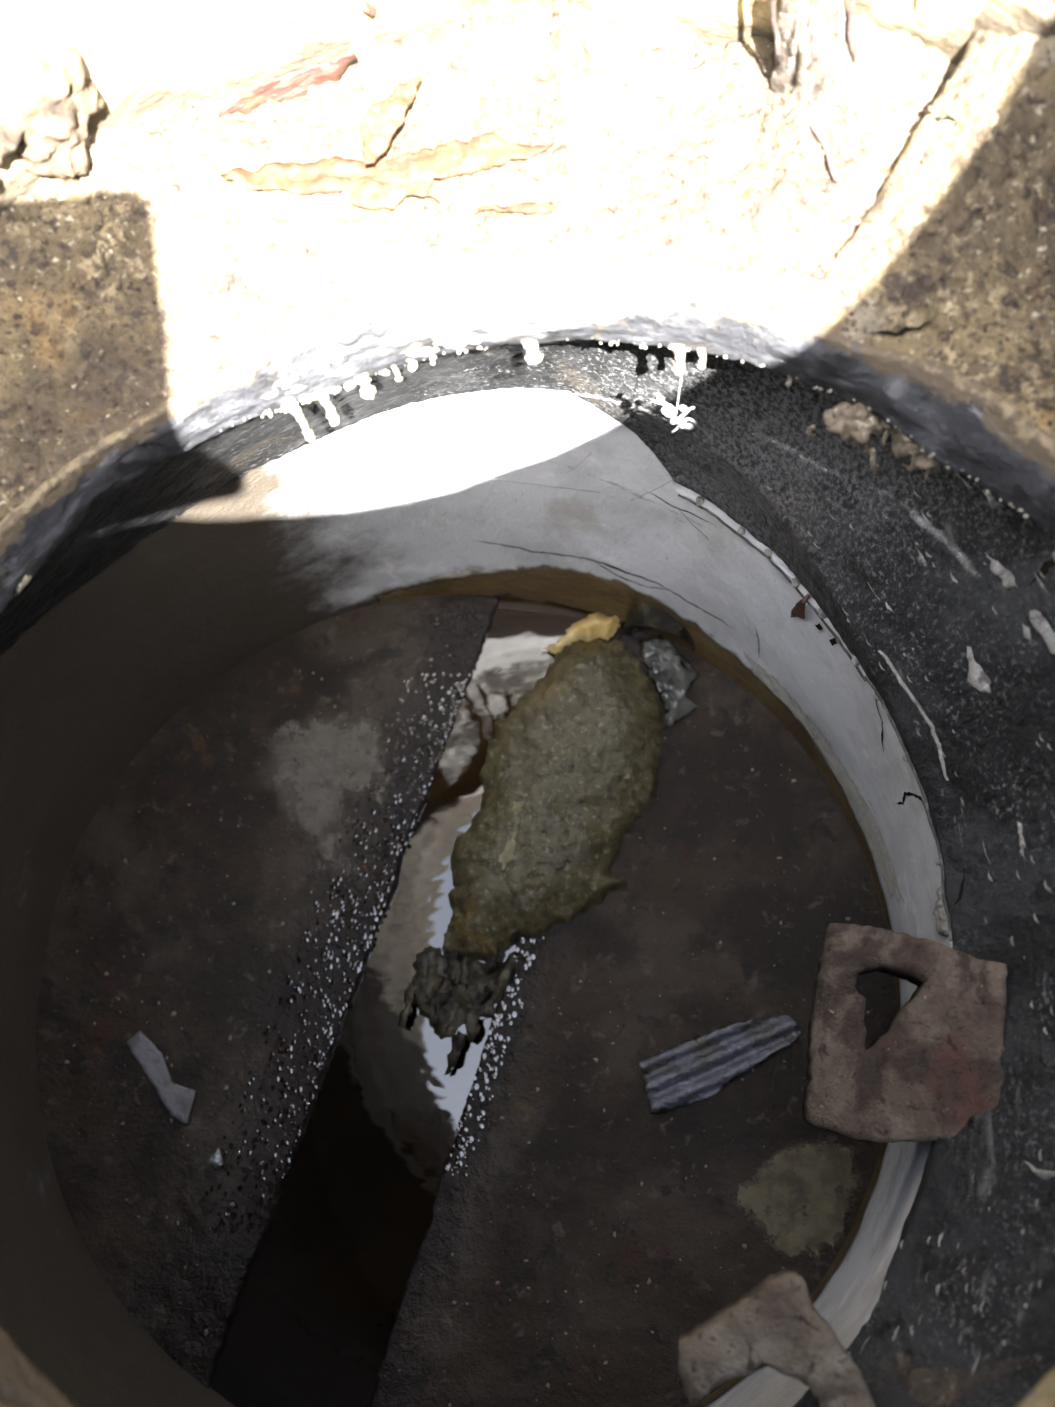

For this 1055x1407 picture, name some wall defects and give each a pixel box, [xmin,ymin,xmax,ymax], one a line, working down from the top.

leakage [261,369,390,418]